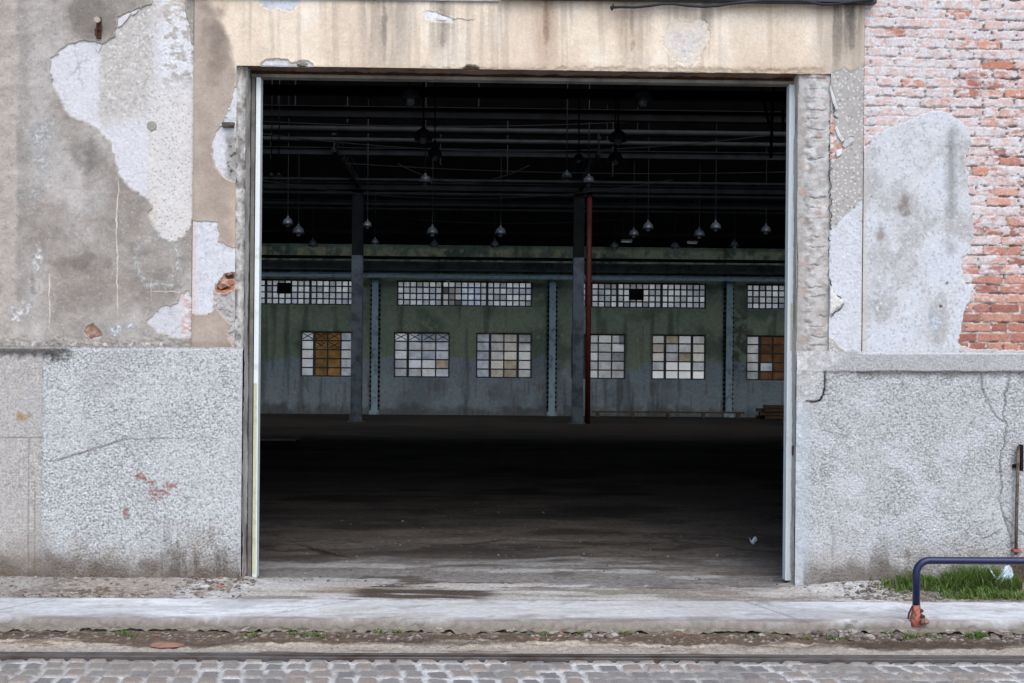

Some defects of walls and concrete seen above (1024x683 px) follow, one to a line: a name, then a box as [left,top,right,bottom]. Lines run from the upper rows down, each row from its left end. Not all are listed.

flaking render [423,11,474,23]
spalling [830,85,854,160]
flaking render [49,0,237,346]
flaking render [829,110,1024,353]
efflorescence [30,249,43,287]
efflorescence [10,300,32,322]
crack [807,373,826,403]
crack [51,437,186,462]
crack [981,374,1024,545]